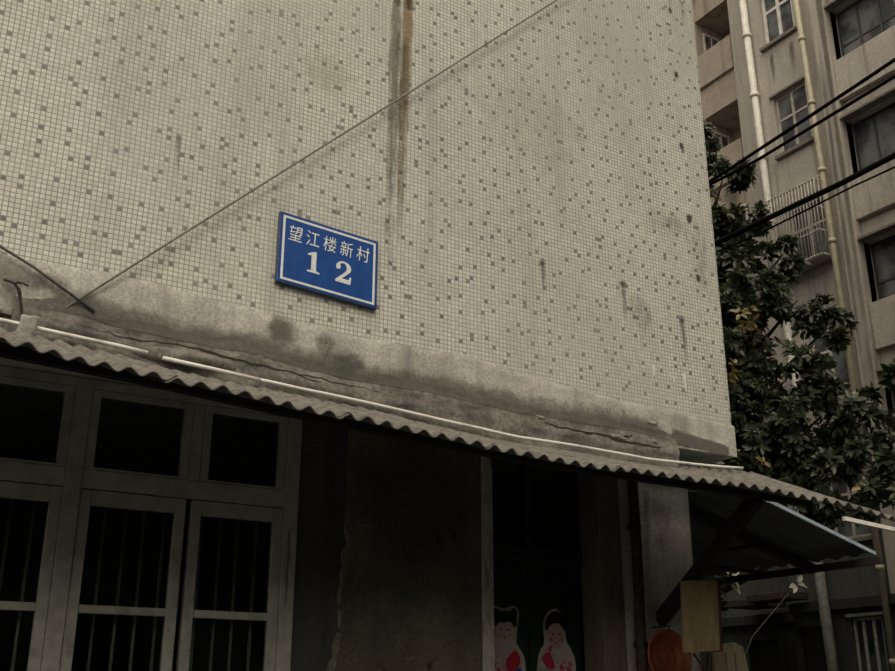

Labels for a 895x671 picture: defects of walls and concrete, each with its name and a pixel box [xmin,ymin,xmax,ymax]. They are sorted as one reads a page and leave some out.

corrosion [388,0,413,201]
crack [85,326,379,392]
leakage [0,262,729,455]
crack [545,422,662,448]